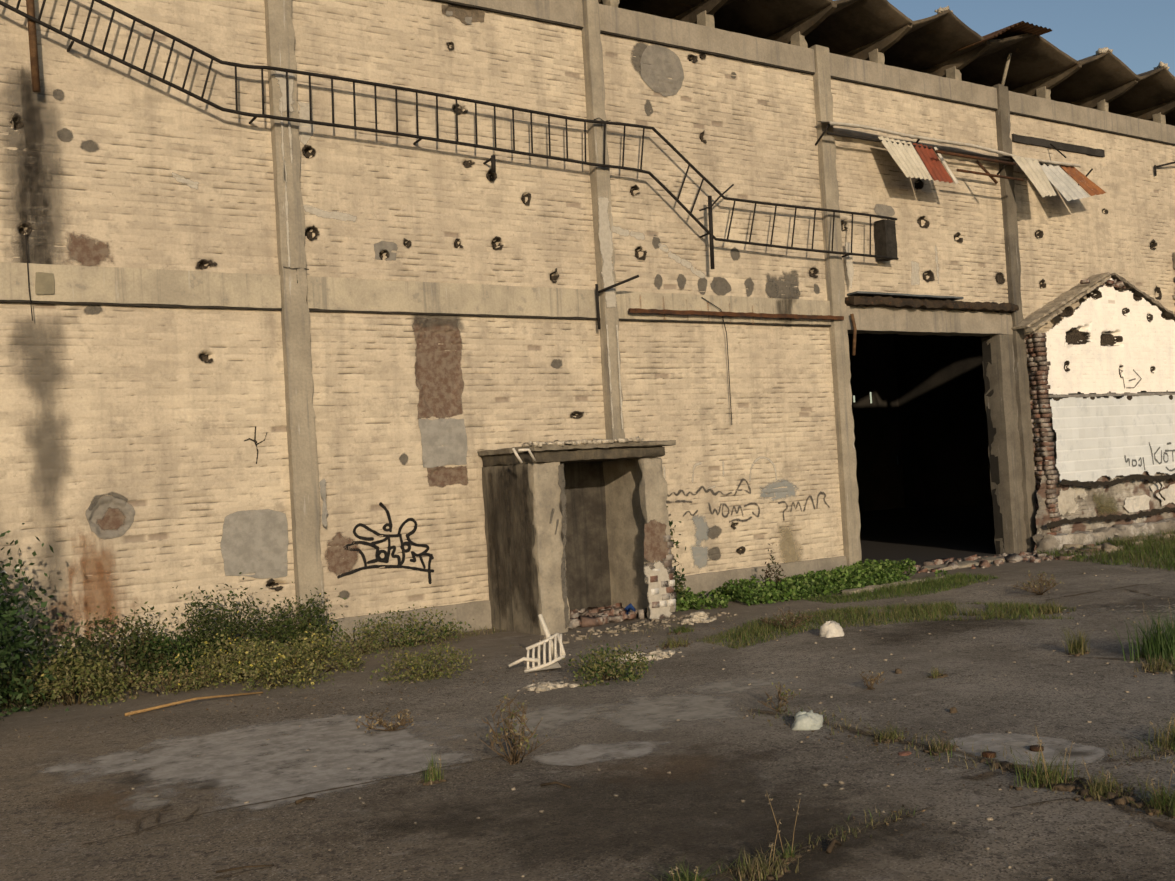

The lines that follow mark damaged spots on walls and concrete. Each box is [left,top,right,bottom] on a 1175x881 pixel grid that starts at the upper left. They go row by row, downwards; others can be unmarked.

damp [6,69,59,264]
damp [16,324,61,504]
peeling [412,315,464,419]
peeling [427,466,468,487]
spalling [1024,333,1088,535]
spalling [1058,306,1123,346]
flaking render [1124,481,1175,513]
corrosion [71,553,116,639]